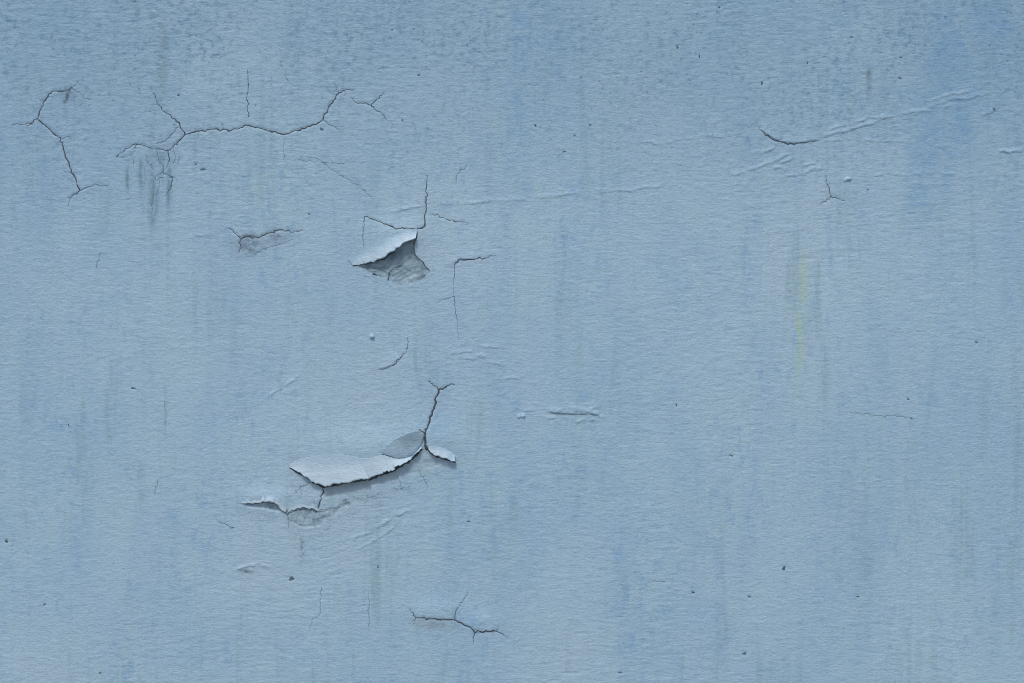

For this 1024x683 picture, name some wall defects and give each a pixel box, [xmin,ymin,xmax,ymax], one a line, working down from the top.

crack [13,85,108,205]
crack [116,70,386,210]
crack [761,130,817,145]
peeling [349,181,434,290]
crack [437,255,495,340]
peeling [238,381,455,537]
crack [410,592,503,642]